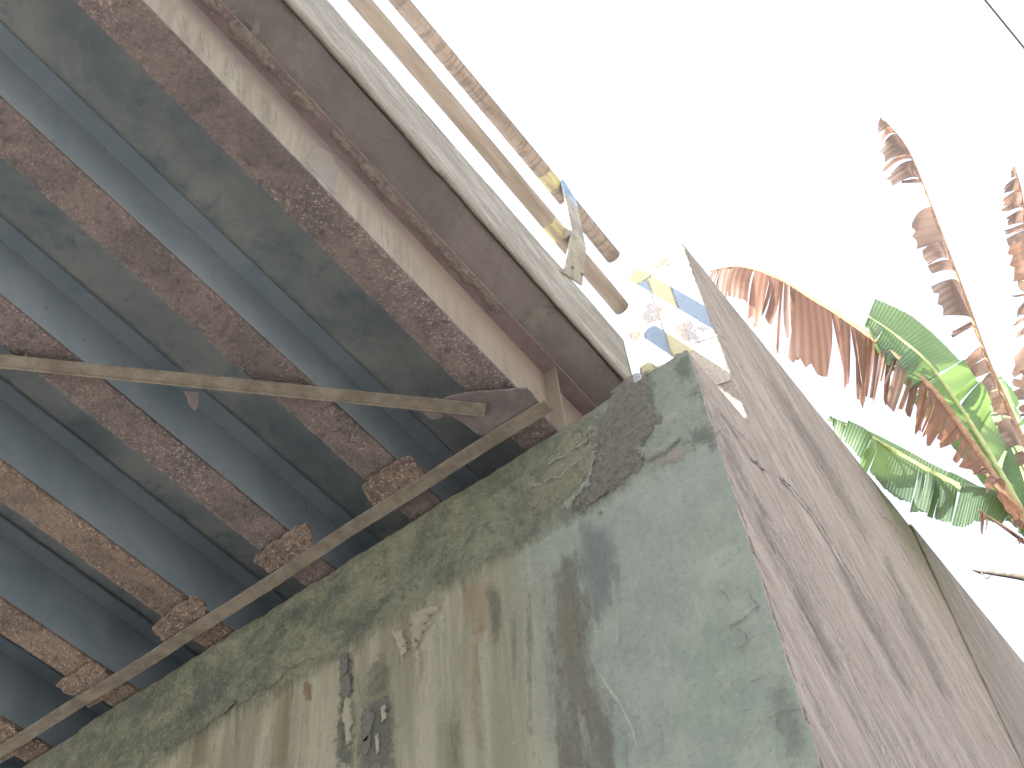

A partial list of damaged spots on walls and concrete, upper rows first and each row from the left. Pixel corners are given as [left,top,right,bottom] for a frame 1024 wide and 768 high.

spalling [555,370,684,515]
crack [716,405,894,650]
peeling [332,652,398,768]
water stain [390,603,440,684]
water stain [550,554,613,768]